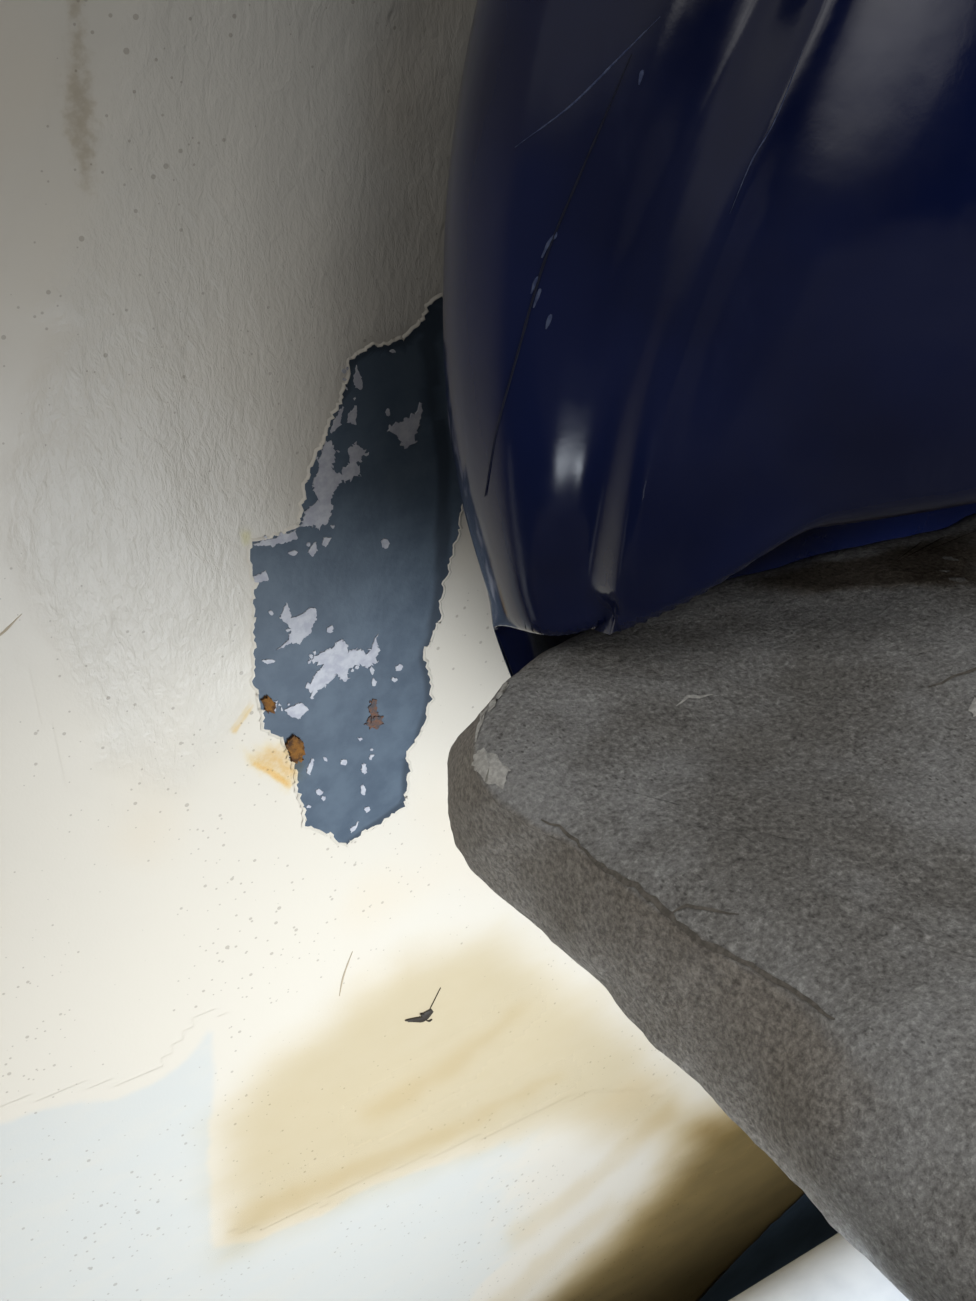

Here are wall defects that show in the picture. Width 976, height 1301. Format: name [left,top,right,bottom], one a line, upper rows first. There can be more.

peeling [247,293,464,848]
rust [260,694,277,714]
rust [364,699,384,729]
rust [285,734,306,764]
water stain [569,1127,805,1301]